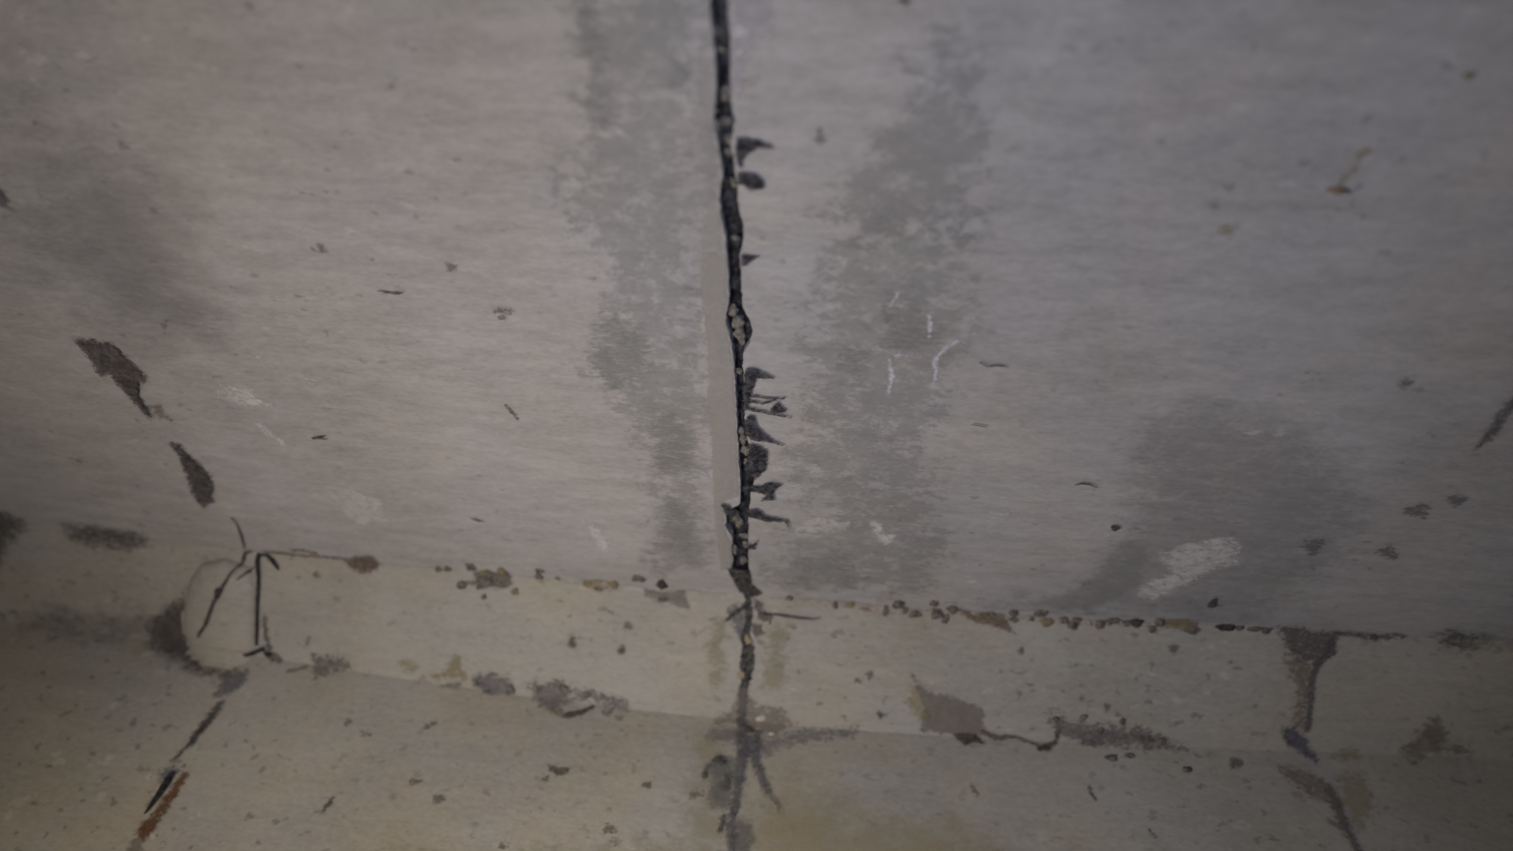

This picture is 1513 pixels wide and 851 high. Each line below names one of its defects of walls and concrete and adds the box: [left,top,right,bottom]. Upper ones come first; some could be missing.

spalling [74,339,172,421]
water stain [927,315,960,381]
crack [701,0,821,851]
crack [1475,399,1513,450]
spalling [170,442,214,507]
water stain [869,520,896,544]
crack [1405,496,1467,519]
crack [170,702,223,761]
spalling [909,674,985,746]
rust [127,764,189,851]
crack [1278,765,1361,851]